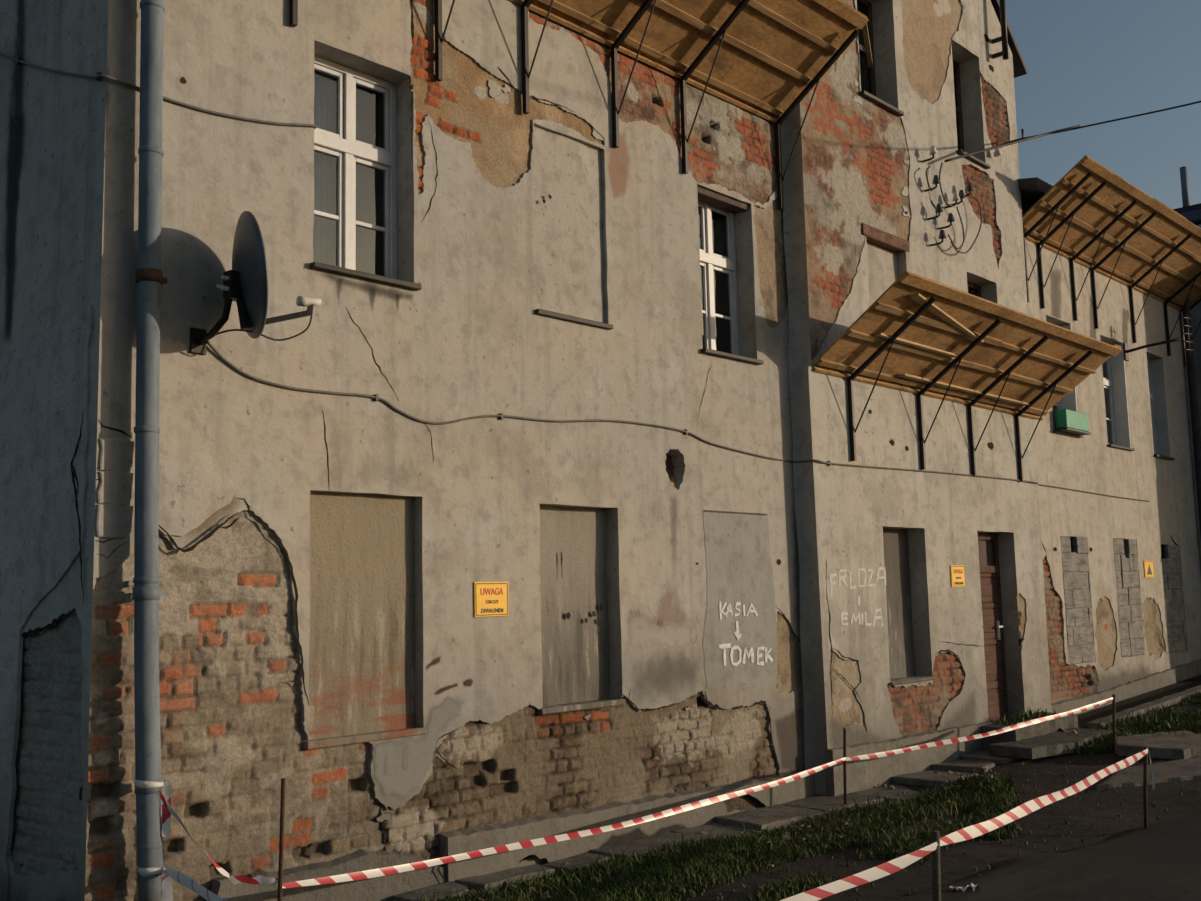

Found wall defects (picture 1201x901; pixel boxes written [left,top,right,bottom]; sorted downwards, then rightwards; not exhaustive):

flaking render [409,0,604,194]
peeling [529,9,788,328]
peeling [800,37,911,361]
flaking render [902,0,961,104]
flaking render [962,165,1001,265]
crack [21,408,132,637]
flaking render [79,438,138,901]
crack [158,497,309,704]
crack [322,410,330,491]
crack [346,307,398,398]
flaking render [158,510,777,901]
flaking render [1043,547,1116,703]